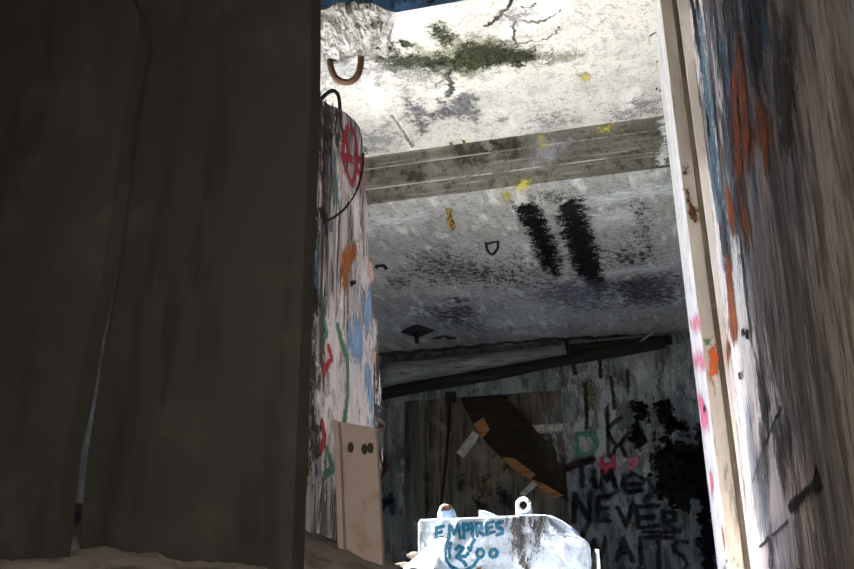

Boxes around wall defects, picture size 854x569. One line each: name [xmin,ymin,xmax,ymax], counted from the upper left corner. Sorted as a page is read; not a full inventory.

spalling [321,0,399,65]
crack [483,0,561,45]
water stain [453,112,581,169]
water stain [307,25,553,488]